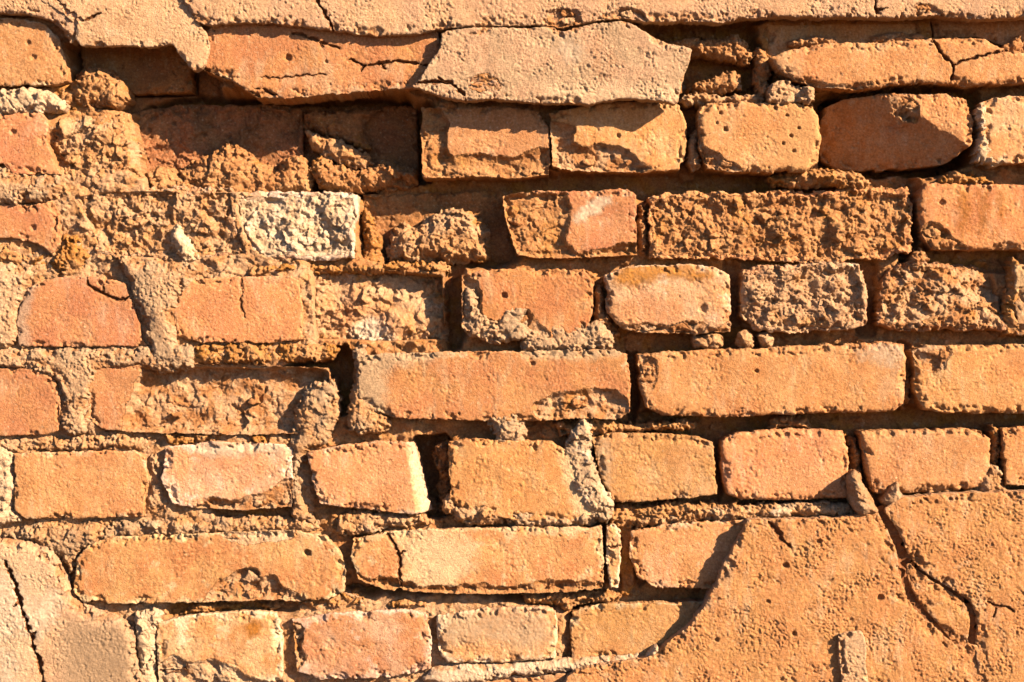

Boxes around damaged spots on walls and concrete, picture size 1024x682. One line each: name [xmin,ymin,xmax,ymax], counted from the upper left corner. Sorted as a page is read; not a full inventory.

crack [292,0,498,96]
crack [933,39,1012,82]
spalling [78,189,355,259]
spalling [503,192,637,259]
spalling [881,263,1003,329]
spalling [121,363,330,436]
crack [4,560,45,682]
flaking render [0,537,145,682]
spalling [202,567,302,602]
spalling [356,572,603,594]
flaking render [564,469,1024,682]
crack [877,505,1014,645]